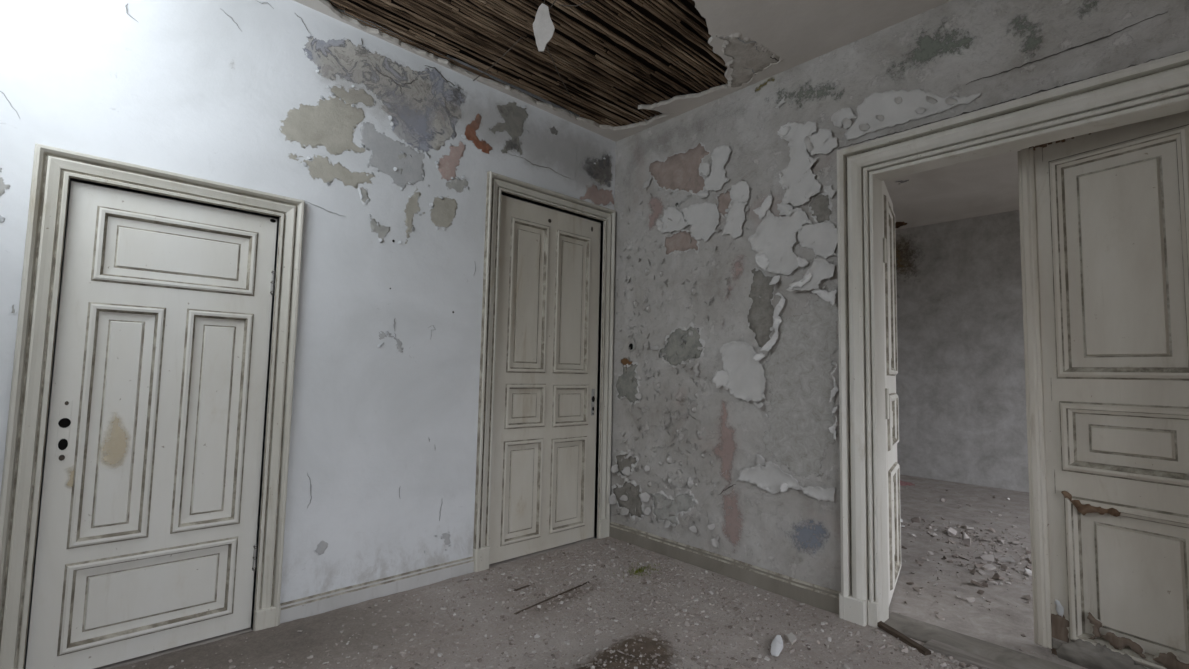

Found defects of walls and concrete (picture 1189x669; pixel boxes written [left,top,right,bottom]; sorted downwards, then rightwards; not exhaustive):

flaking render [279,0,784,244]
peeling [608,89,981,549]